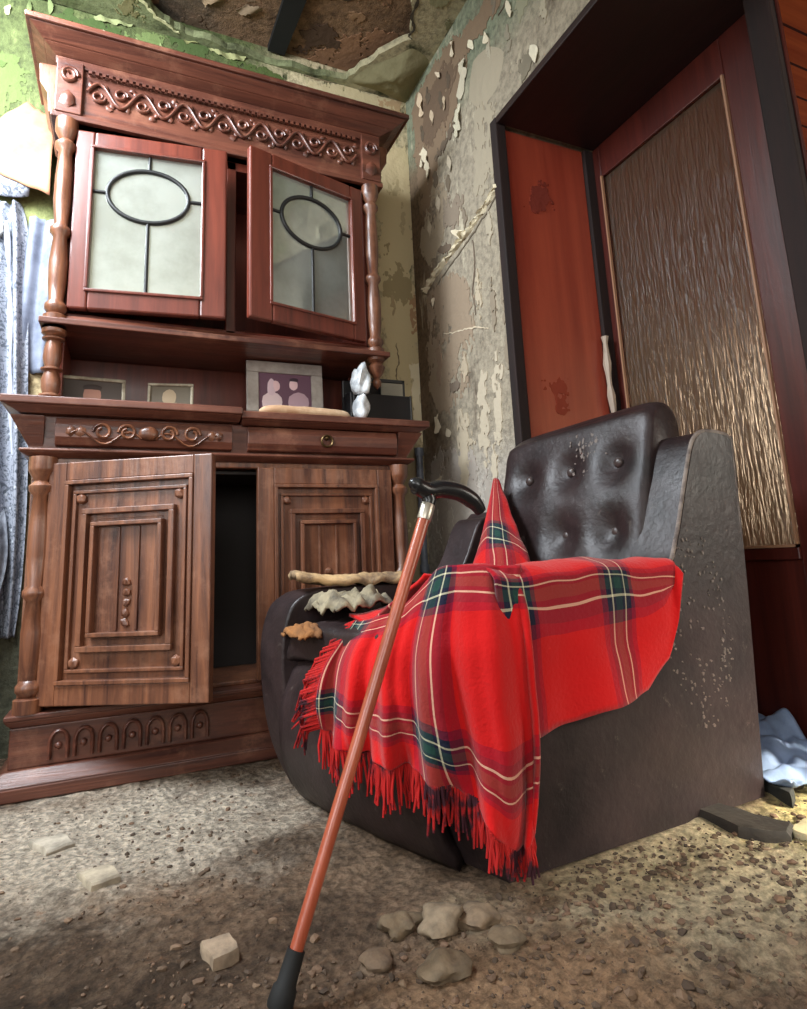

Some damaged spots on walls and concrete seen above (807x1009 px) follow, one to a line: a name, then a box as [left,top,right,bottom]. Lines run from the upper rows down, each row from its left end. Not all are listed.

damp [52,8,122,35]
peeling [93,15,133,27]
peeling [236,5,262,16]
flaking render [292,23,342,55]
peeling [184,40,246,61]
peeling [529,44,538,63]
damp [229,59,284,80]
flaking render [309,0,512,442]